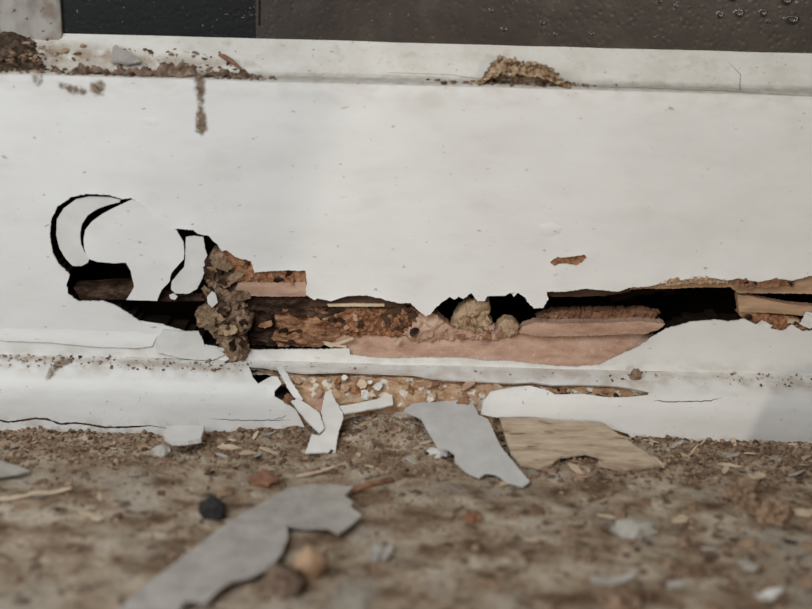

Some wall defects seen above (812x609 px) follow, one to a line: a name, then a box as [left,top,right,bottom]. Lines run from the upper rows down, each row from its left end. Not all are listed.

peeling [56,196,207,301]
peeling [551,255,586,266]
peeling [0,320,162,348]
peeling [337,313,375,332]
peeling [410,319,433,338]
peeling [479,319,503,340]
peeling [276,365,303,400]
crack [0,417,163,428]
crack [219,414,287,422]
peeling [305,390,393,454]
peeling [164,425,205,446]